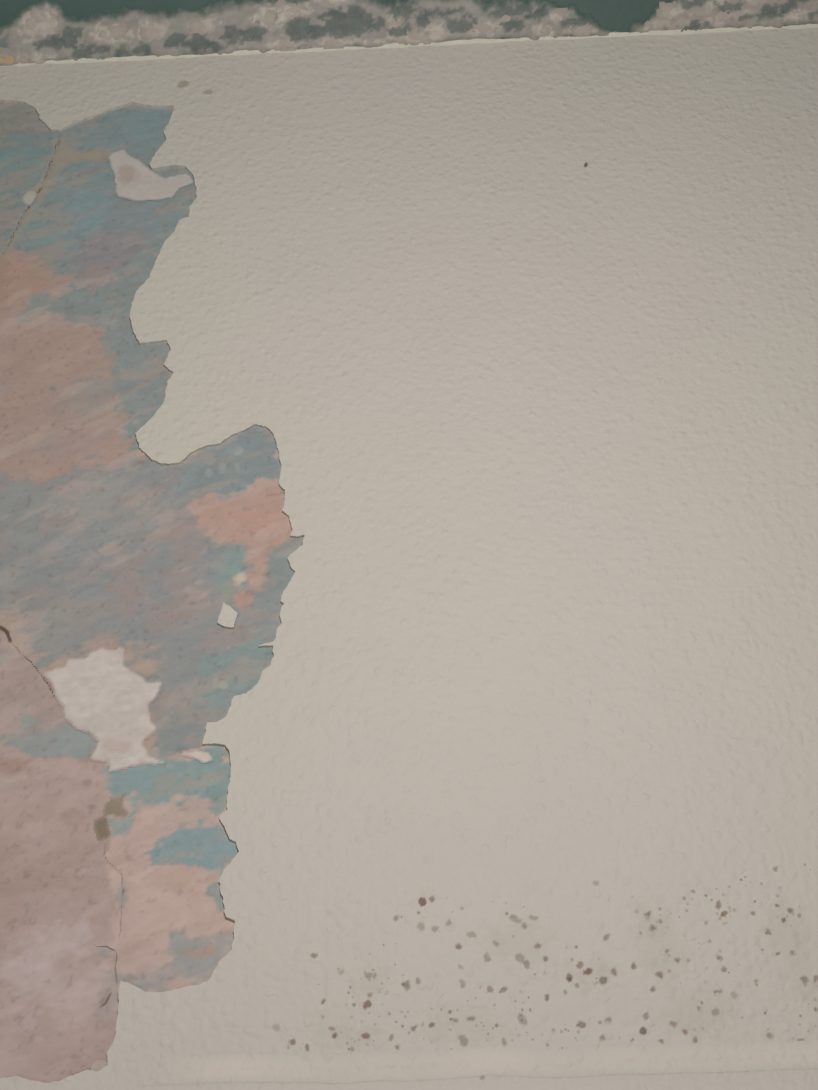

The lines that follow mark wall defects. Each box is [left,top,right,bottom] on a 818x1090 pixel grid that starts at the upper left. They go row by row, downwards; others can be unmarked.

crack [0,626,58,702]
peeling [0,102,304,1083]